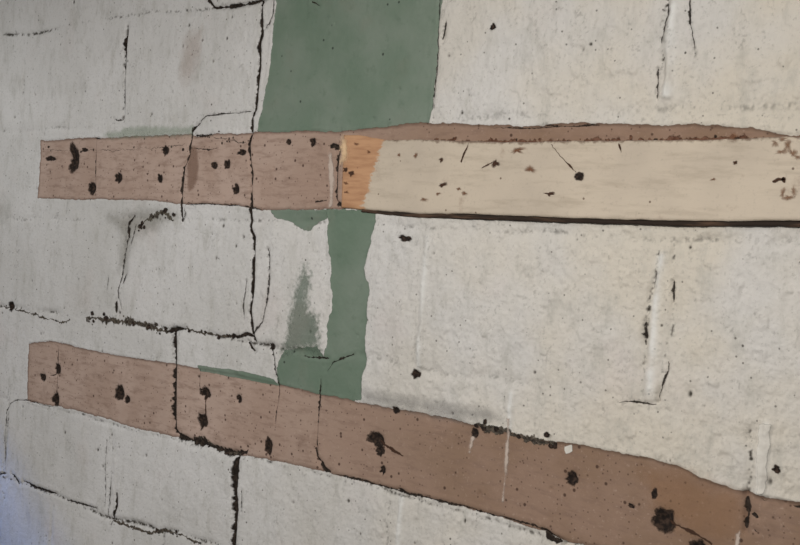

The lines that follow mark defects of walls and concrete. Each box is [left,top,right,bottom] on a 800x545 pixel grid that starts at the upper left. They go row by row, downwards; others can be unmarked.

crack [122,34,130,74]
crack [687,0,695,48]
peeling [37,0,800,211]
crack [180,0,280,422]
crack [315,143,342,206]
crack [107,215,136,313]
peeling [27,208,800,545]
crack [619,361,669,405]
crack [641,322,649,345]
crack [0,399,118,524]
crack [167,326,248,545]